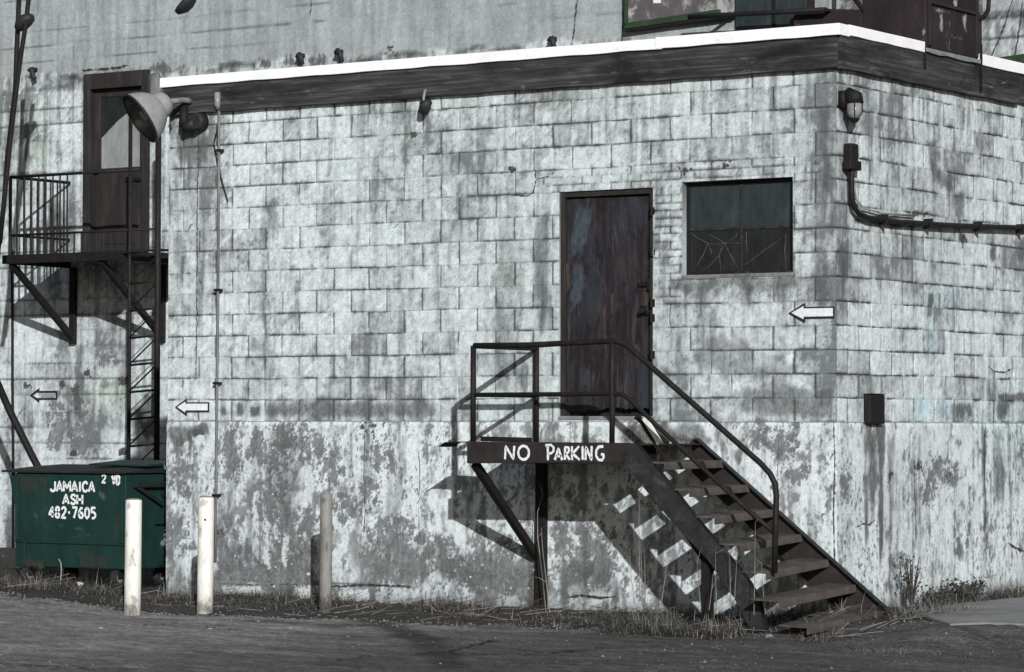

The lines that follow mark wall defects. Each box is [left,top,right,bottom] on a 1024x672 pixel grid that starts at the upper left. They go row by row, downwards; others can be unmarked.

crack [514,170,553,197]
water stain [930,144,963,237]
water stain [68,349,84,421]
peeling [160,453,197,559]
peeling [213,420,535,598]
peeling [744,418,811,490]
peeling [833,462,854,505]
peeling [914,451,961,509]
peeling [889,546,910,591]
peeling [951,534,969,560]